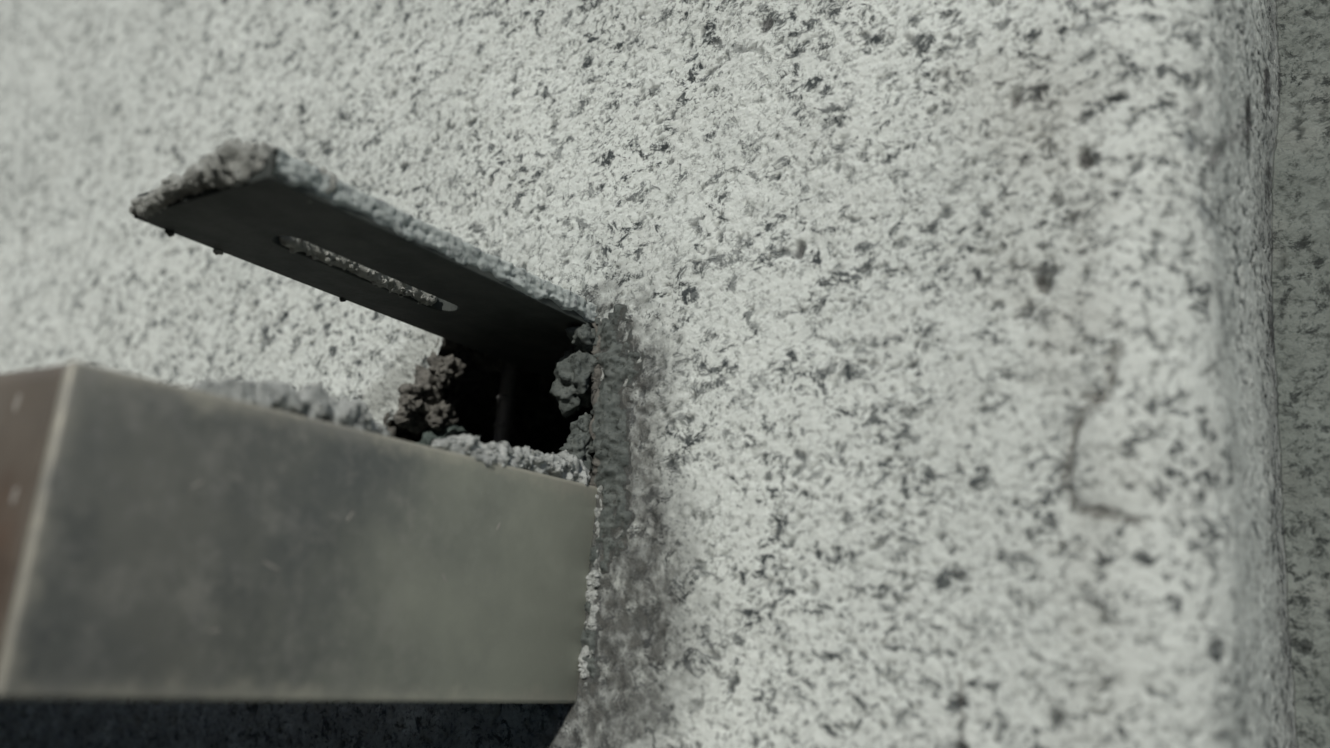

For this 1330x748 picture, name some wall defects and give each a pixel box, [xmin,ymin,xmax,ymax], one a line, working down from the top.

spalling [383,338,503,444]
spalling [510,304,644,577]
spalling [580,596,603,685]